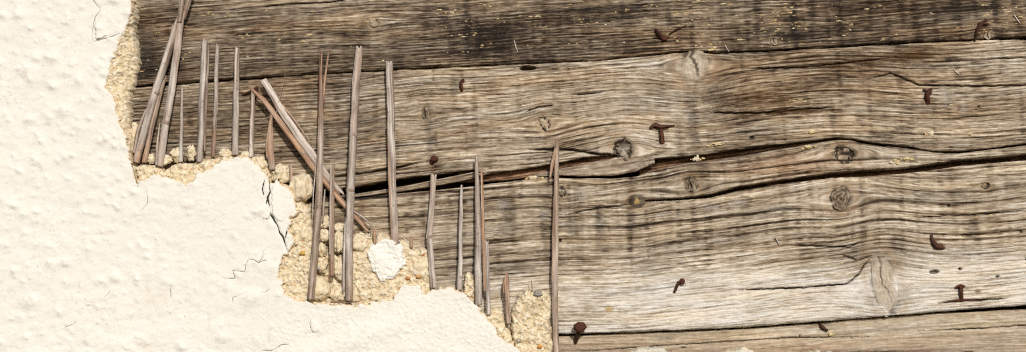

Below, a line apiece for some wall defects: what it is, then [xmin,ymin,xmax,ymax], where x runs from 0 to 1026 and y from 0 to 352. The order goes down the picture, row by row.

spalling [94,0,434,306]
crack [229,180,288,300]
spalling [463,272,554,352]